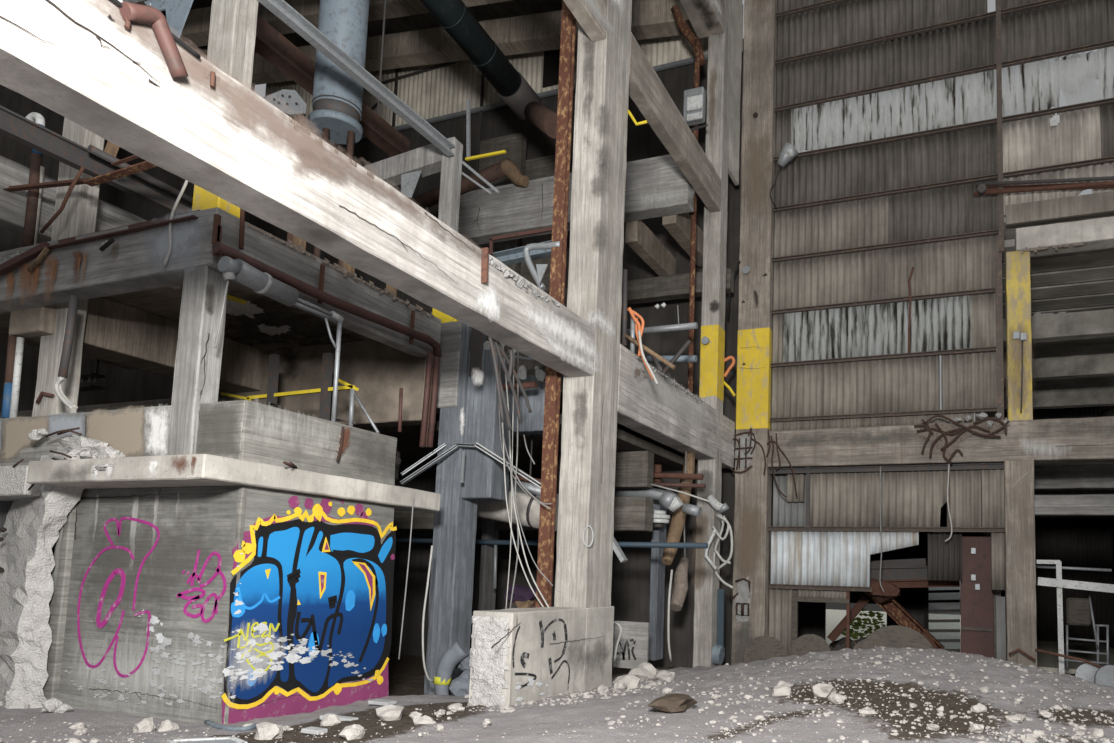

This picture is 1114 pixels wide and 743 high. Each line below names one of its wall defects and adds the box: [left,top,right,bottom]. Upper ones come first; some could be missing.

spalling [247,223,434,319]
spalling [28,427,125,473]
spalling [0,484,85,713]
peeling [64,610,373,706]